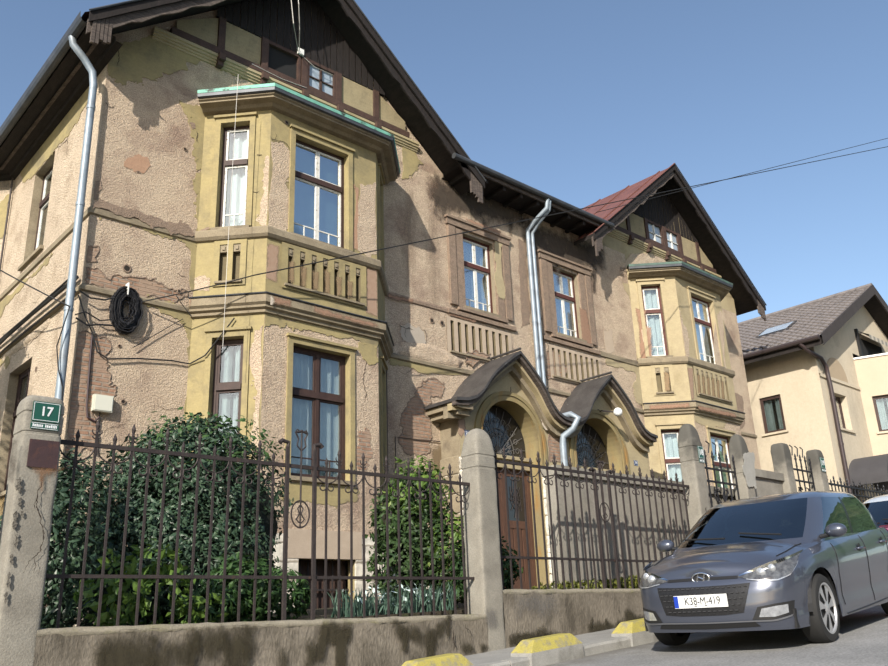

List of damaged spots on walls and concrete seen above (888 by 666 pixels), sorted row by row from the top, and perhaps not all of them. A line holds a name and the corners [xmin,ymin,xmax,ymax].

peeling [107,35,201,86]
flaking render [85,100,210,360]
peeling [266,244,279,281]
peeling [314,182,378,326]
flaking render [65,330,117,456]
flaking render [249,296,463,460]
flaking render [356,428,373,472]
crack [23,479,45,577]
leakage [316,626,349,666]
leakage [427,630,435,657]